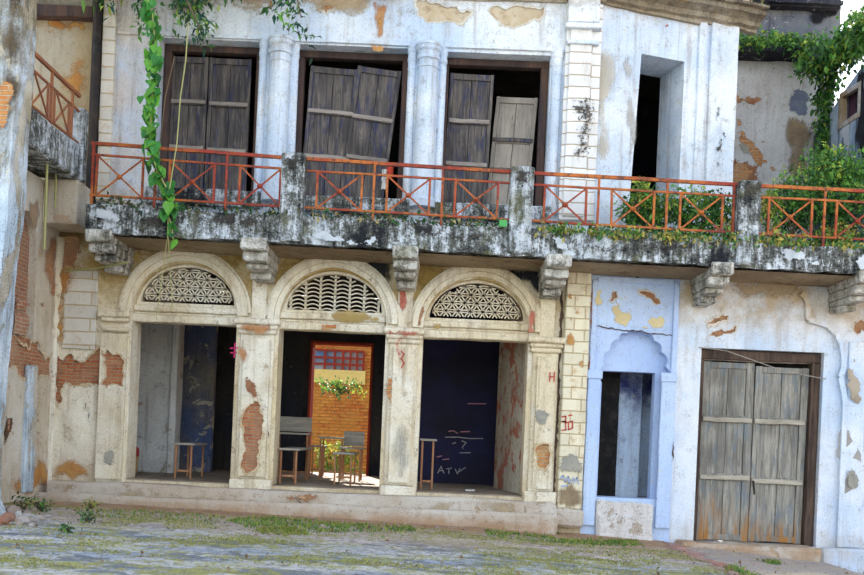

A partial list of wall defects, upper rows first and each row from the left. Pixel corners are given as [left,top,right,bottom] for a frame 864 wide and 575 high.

water stain [3,0,19,58]
peeling [413,0,474,26]
peeling [487,3,546,30]
flaking render [0,79,14,129]
water stain [5,71,19,97]
water stain [855,71,864,179]
flaking render [733,119,776,183]
peeling [704,314,738,337]
peeling [851,317,864,335]
flaking render [8,299,126,405]
peeling [847,359,861,404]
flaking render [239,377,265,475]